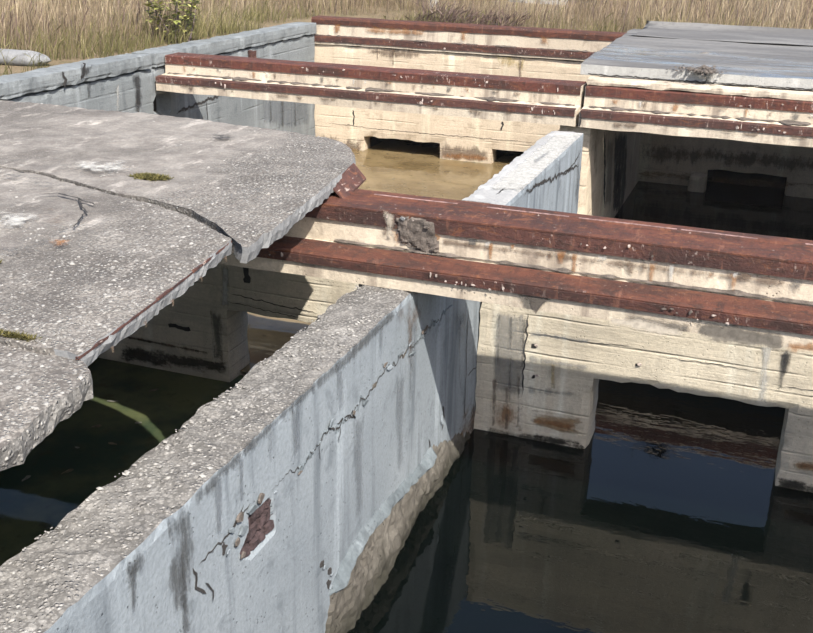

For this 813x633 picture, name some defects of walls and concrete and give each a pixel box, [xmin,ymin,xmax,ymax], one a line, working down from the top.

crack [178,95,218,119]
crack [497,151,581,196]
crack [47,193,95,230]
spalling [386,215,439,255]
water stain [122,313,226,373]
spalling [257,310,382,377]
crack [522,316,633,394]
water stain [199,313,393,499]
crack [274,305,476,494]
corrosion [535,417,579,432]
spalling [0,381,276,633]
crack [193,503,251,600]